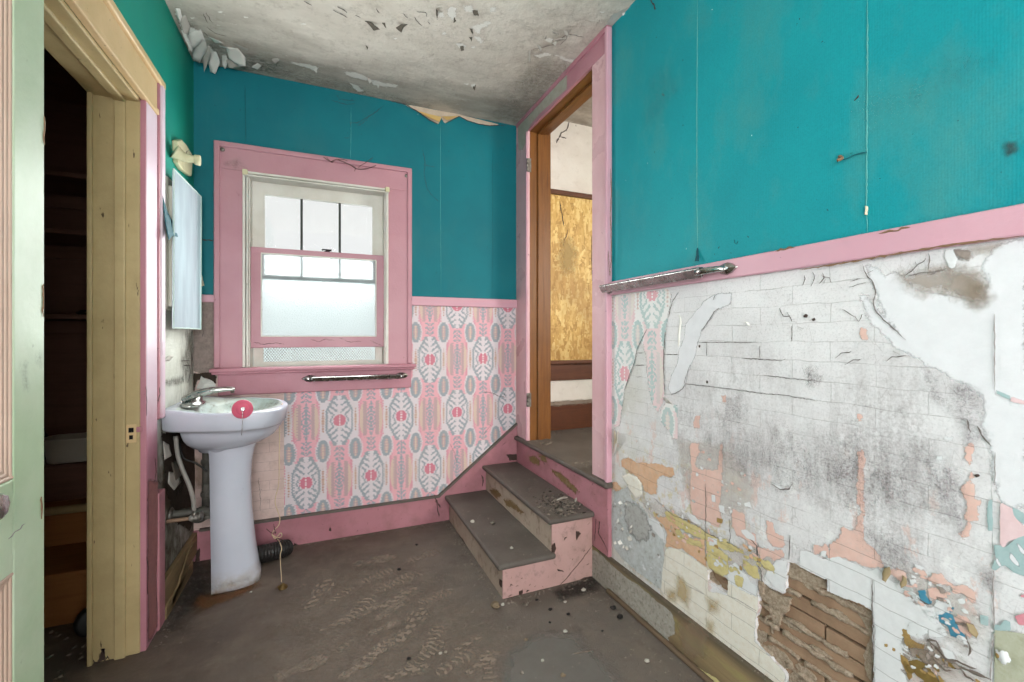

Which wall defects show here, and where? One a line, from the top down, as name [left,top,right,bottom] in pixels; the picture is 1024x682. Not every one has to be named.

peeling [174,7,319,74]
peeling [365,21,408,39]
peeling [436,5,496,51]
peeling [344,72,398,92]
peeling [406,104,498,125]
crack [905,253,945,276]
peeling [945,249,958,268]
damp [904,269,982,300]
crack [803,264,907,361]
peeling [580,430,981,682]
flaking render [994,630,1024,682]